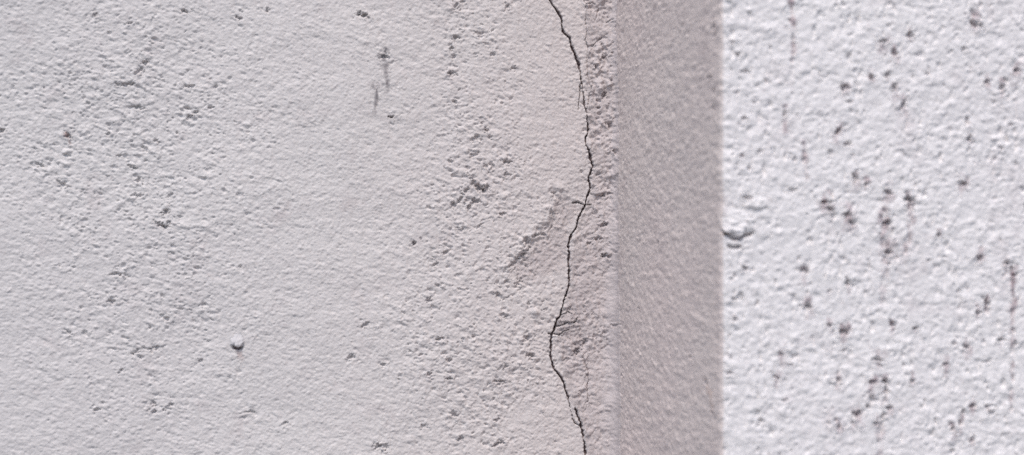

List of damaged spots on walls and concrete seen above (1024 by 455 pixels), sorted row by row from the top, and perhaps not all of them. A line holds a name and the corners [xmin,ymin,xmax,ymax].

crack [549,0,593,454]